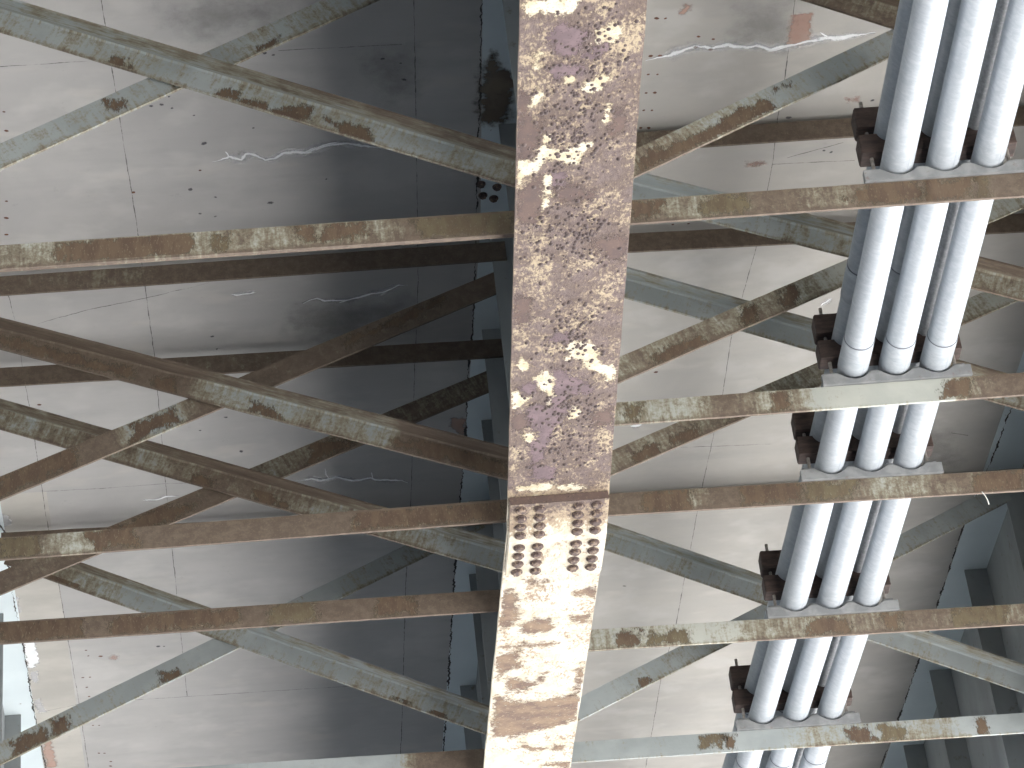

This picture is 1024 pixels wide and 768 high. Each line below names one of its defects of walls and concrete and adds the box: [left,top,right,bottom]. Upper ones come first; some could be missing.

crack [646,32,873,61]
damp [474,53,514,127]
crack [214,142,377,162]
corrosion [839,176,994,207]
corrosion [411,175,598,238]
corrosion [51,233,195,262]
crack [303,285,408,304]
crack [297,469,408,483]
corrosion [0,618,85,642]
corrosion [107,608,243,634]
corrosion [489,579,591,768]
corrosion [698,733,738,750]